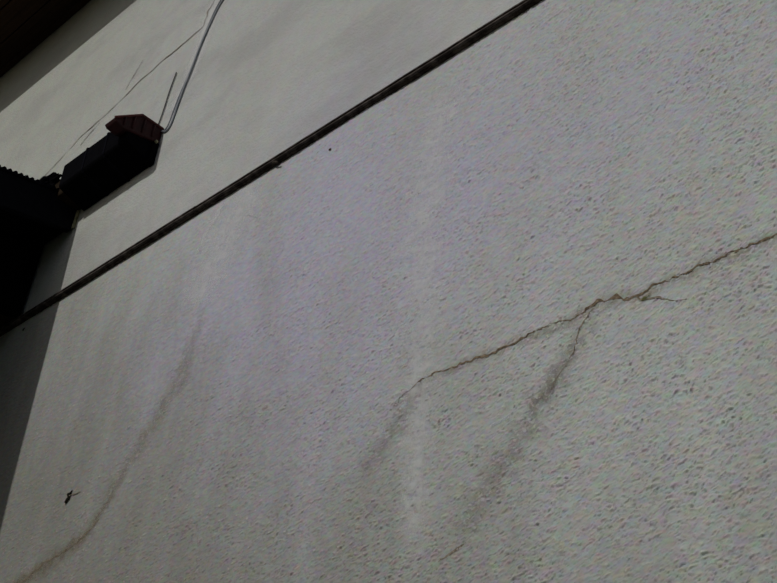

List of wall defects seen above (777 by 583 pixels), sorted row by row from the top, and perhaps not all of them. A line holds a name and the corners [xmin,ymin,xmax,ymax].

crack [387,233,777,413]